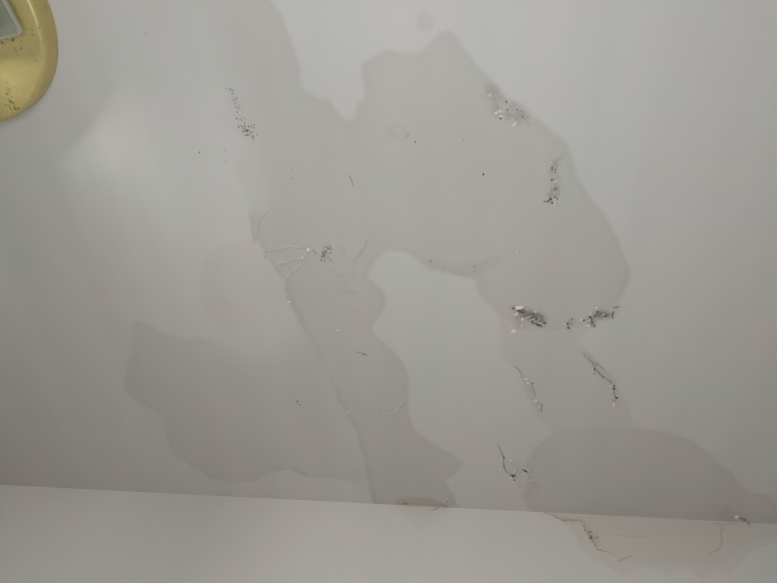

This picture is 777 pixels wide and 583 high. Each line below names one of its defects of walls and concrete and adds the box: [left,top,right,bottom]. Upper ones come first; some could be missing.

flaking render [511,306,546,333]
crack [582,353,618,407]
crack [499,449,534,501]
crack [546,513,632,561]